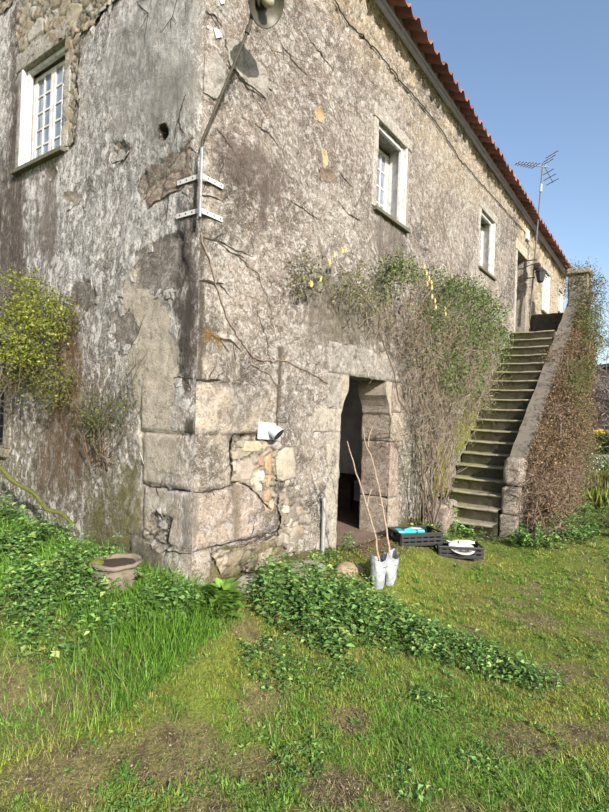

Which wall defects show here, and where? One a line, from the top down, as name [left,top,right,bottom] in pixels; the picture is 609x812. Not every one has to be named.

crack [137,0,177,41]
flaking render [0,0,114,151]
leakage [0,84,28,320]
leakage [35,157,58,261]
flaking render [138,122,196,208]
crack [175,94,186,153]
flaking render [318,147,338,182]
crack [339,171,372,222]
leakage [173,173,205,390]
leakage [184,418,193,436]
flaking render [144,508,171,553]
flaking render [211,432,312,577]